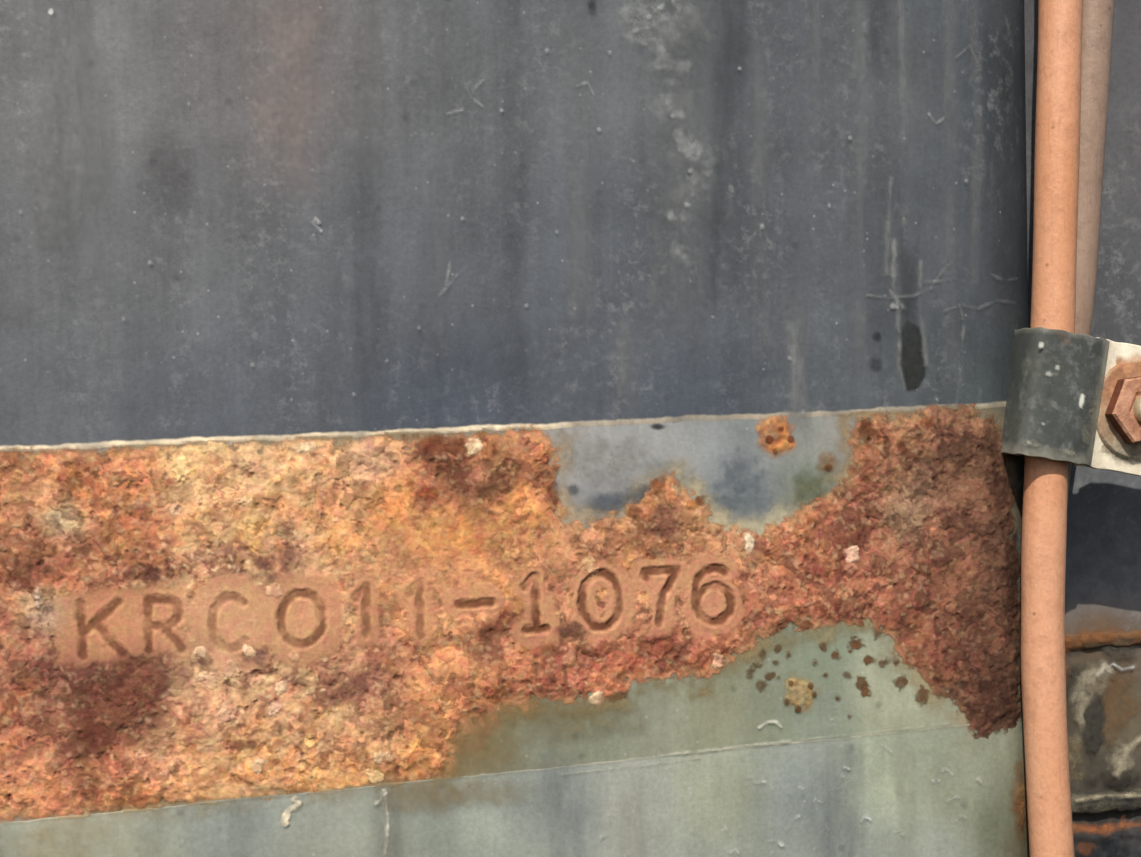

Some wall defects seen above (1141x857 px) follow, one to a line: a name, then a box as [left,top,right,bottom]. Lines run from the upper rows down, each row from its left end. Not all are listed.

leakage [900,275,926,389]
rust [0,403,1022,821]
rust [1065,631,1141,646]
rust [1073,822,1135,833]